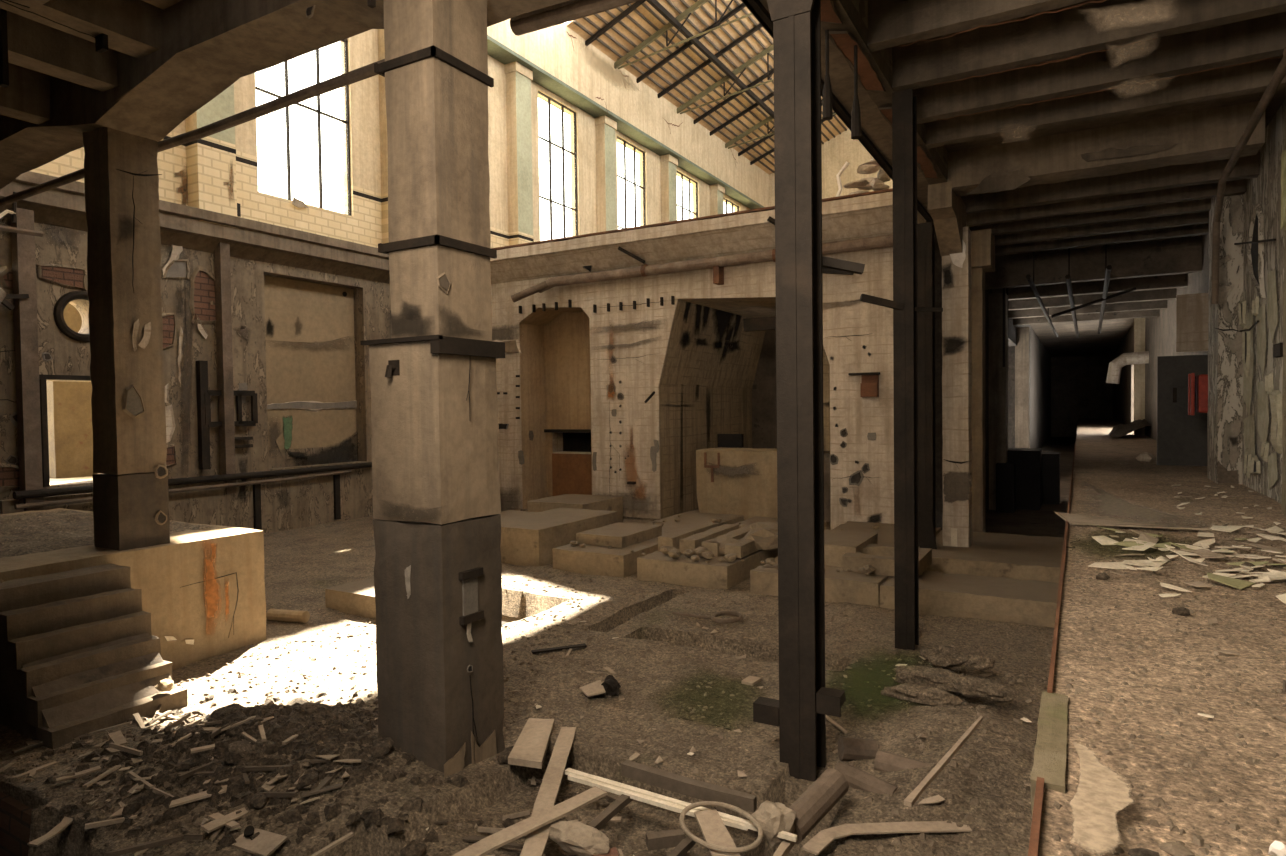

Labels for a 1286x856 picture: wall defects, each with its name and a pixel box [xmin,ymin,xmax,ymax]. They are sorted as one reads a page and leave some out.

corrosion [204,545,229,629]
spalling [1088,202,1286,604]